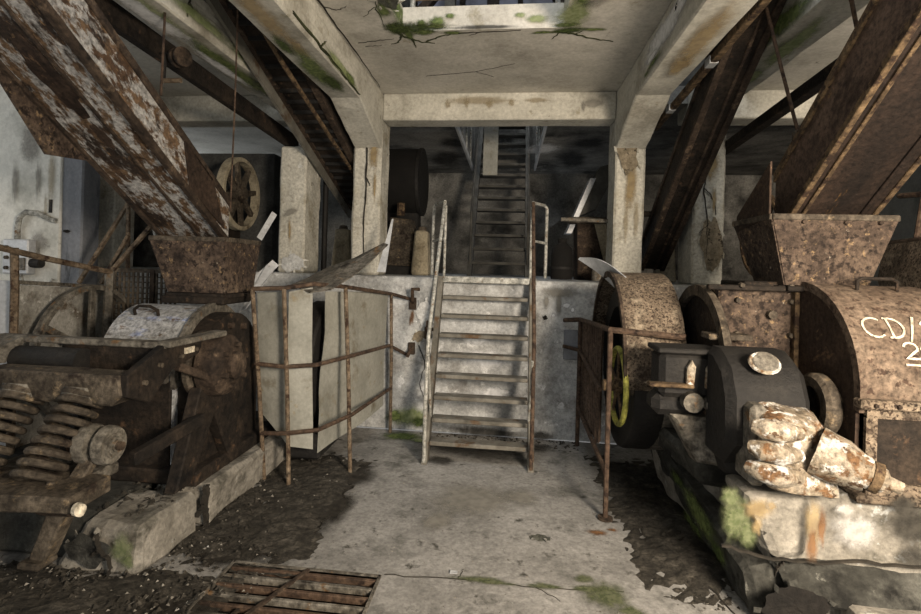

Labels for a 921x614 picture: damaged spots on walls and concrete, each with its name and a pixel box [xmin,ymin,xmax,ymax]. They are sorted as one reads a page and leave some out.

water stain [120,0,190,39]
water stain [197,51,243,83]
rust [11,31,115,150]
rust [626,169,636,204]
rust [807,506,826,557]